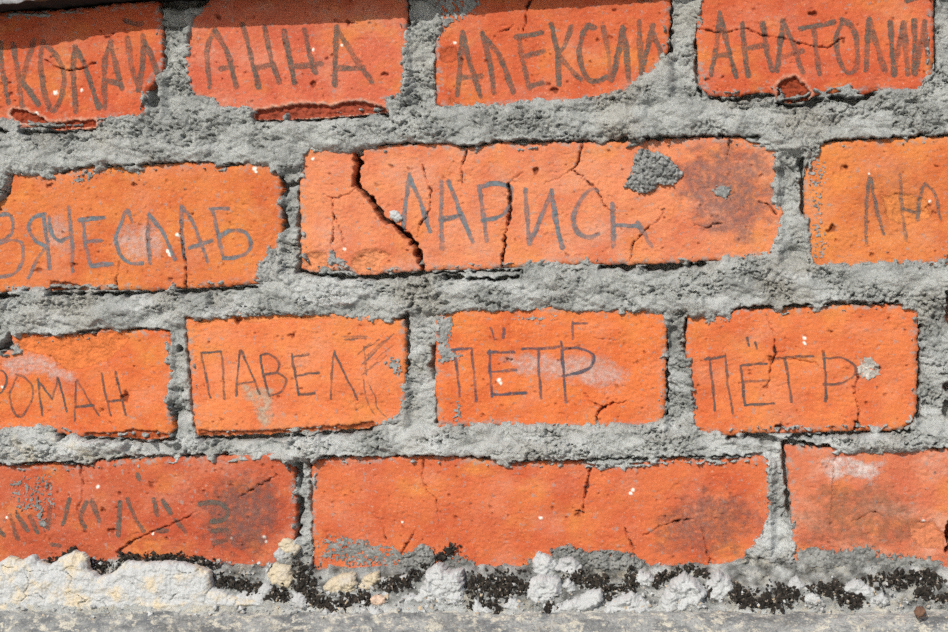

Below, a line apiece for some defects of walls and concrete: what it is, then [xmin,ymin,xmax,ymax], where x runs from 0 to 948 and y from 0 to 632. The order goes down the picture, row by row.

spalling [777,77,810,102]
spalling [11,109,96,129]
spalling [255,102,387,120]
crack [356,158,433,259]
crack [940,523,948,550]